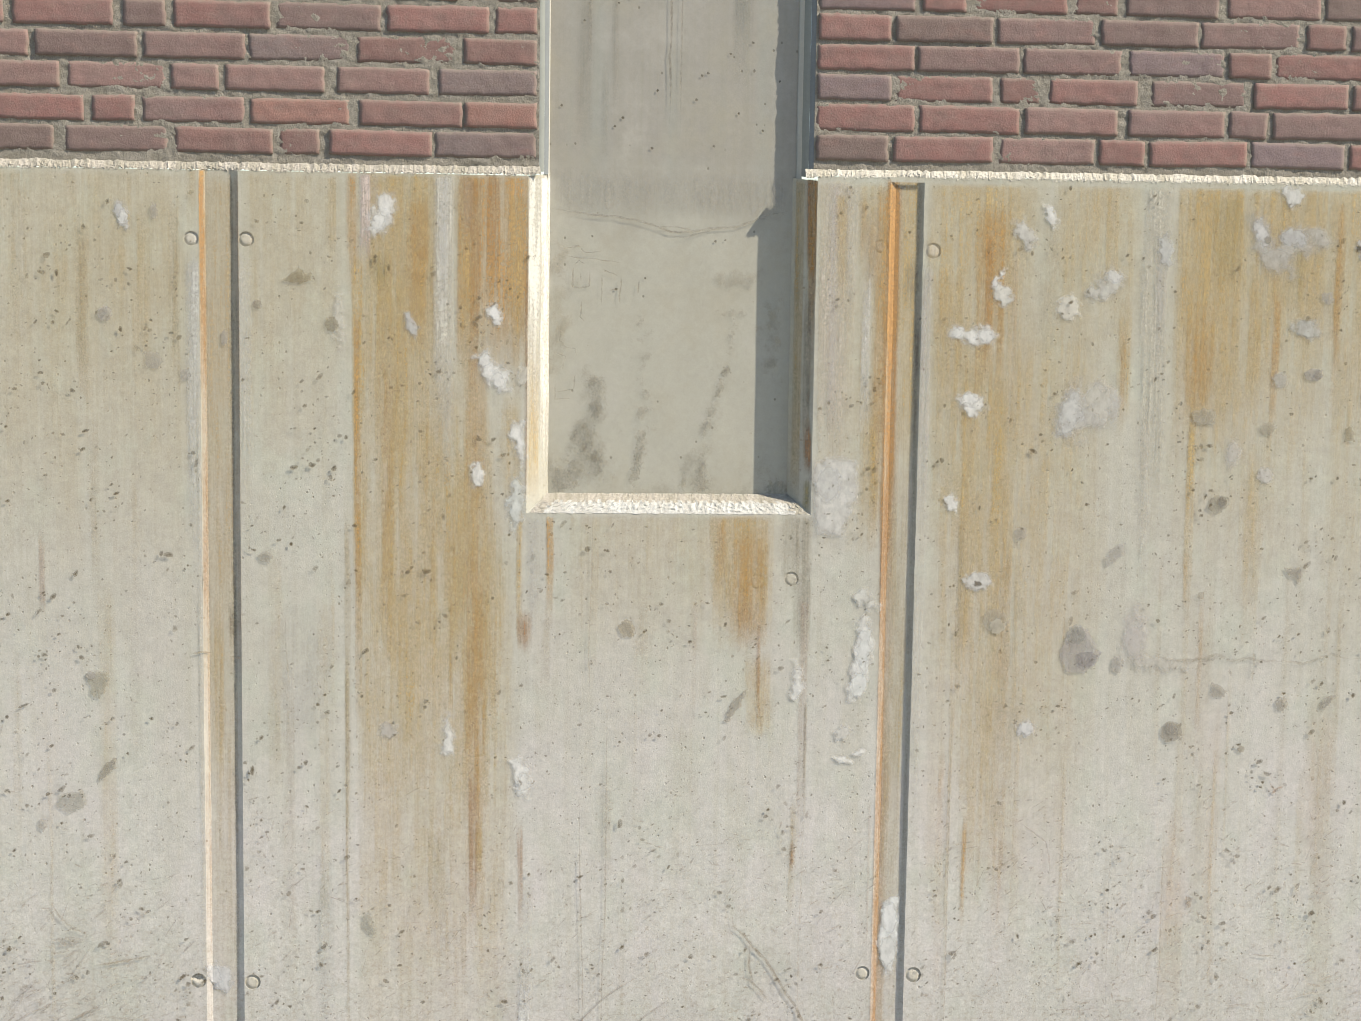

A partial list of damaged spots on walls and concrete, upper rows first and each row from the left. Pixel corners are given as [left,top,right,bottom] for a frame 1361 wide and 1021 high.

peeling [1283,185,1305,207]
rust [458,178,528,332]
peeling [1254,218,1329,272]
rust [353,246,364,565]
peeling [475,352,508,392]
rust [869,183,918,632]
peeling [1058,384,1119,436]
peeling [814,459,857,535]
peeling [846,589,874,701]
peeling [878,897,899,973]